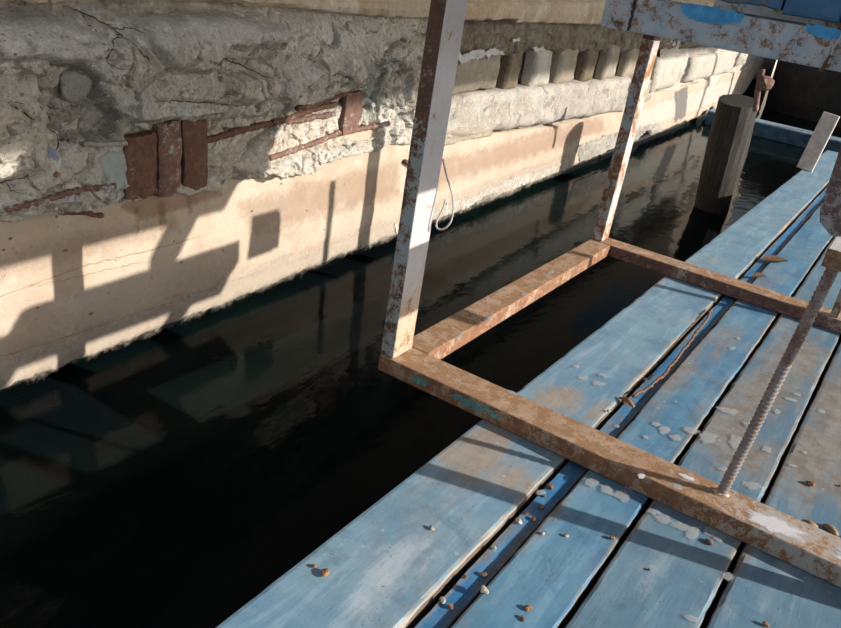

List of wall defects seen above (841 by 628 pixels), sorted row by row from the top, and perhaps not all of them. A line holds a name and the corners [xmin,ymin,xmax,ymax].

crack [62,4,154,70]
spalling [0,0,428,223]
spalling [634,123,664,142]
spalling [432,132,618,220]
crack [0,228,227,298]